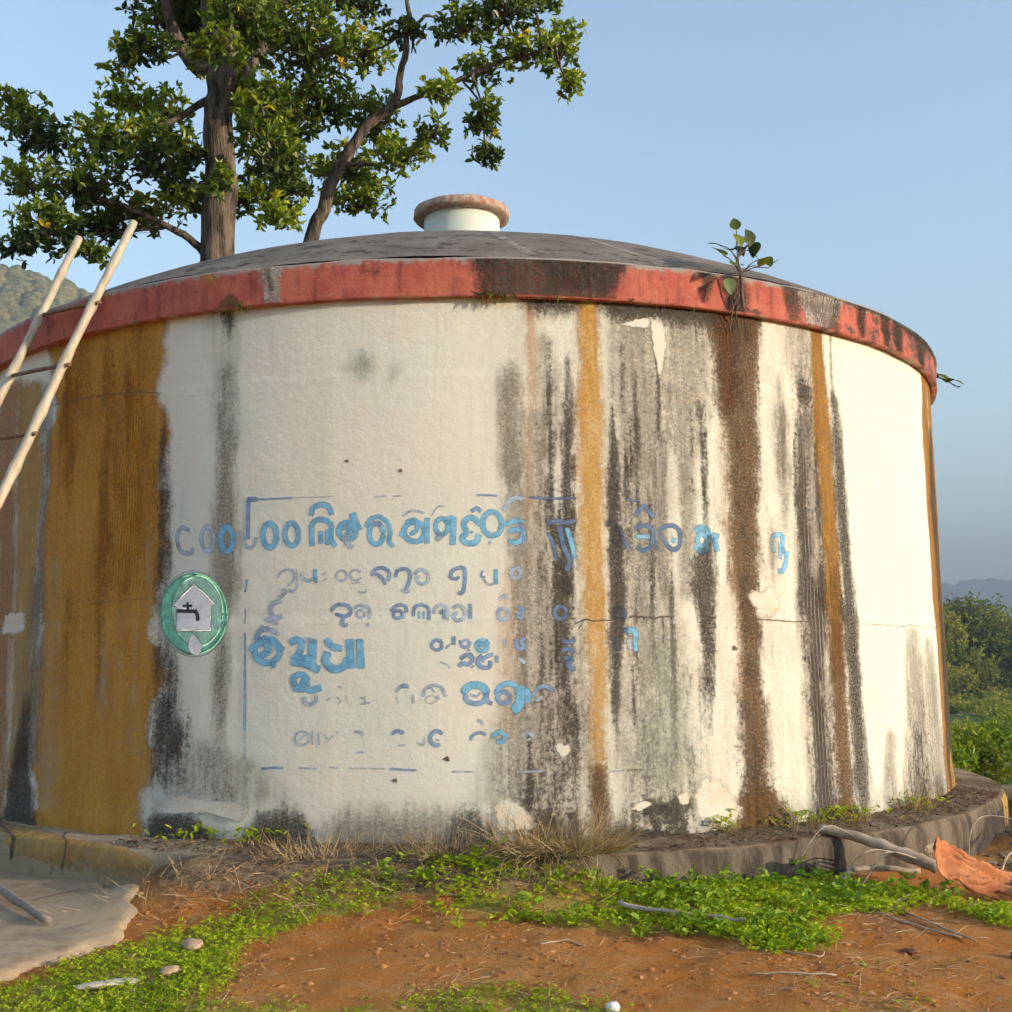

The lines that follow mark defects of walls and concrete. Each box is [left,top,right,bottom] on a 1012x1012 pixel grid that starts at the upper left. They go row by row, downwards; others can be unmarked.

peeling [619,317,666,378]
rust [0,320,171,875]
leakage [156,427,172,617]
leakage [212,412,240,607]
rust [576,301,612,838]
leakage [472,258,937,841]
rust [811,329,858,817]
rust [921,375,956,792]
leakage [151,634,250,798]
leakage [907,631,948,803]
leakage [144,813,215,840]